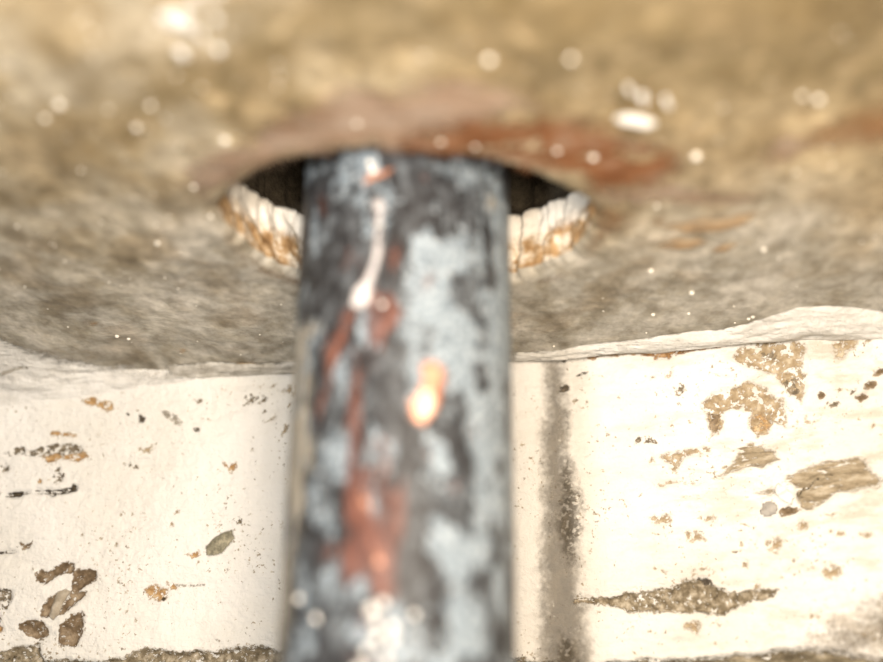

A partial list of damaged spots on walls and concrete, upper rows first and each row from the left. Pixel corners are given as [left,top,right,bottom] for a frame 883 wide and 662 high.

corrosion [183,78,750,204]
spalling [703,341,806,475]
spalling [651,447,709,471]
spalling [760,457,883,529]
spalling [0,588,12,632]
spalling [18,561,97,647]
spalling [574,568,779,633]
peeling [823,565,842,579]